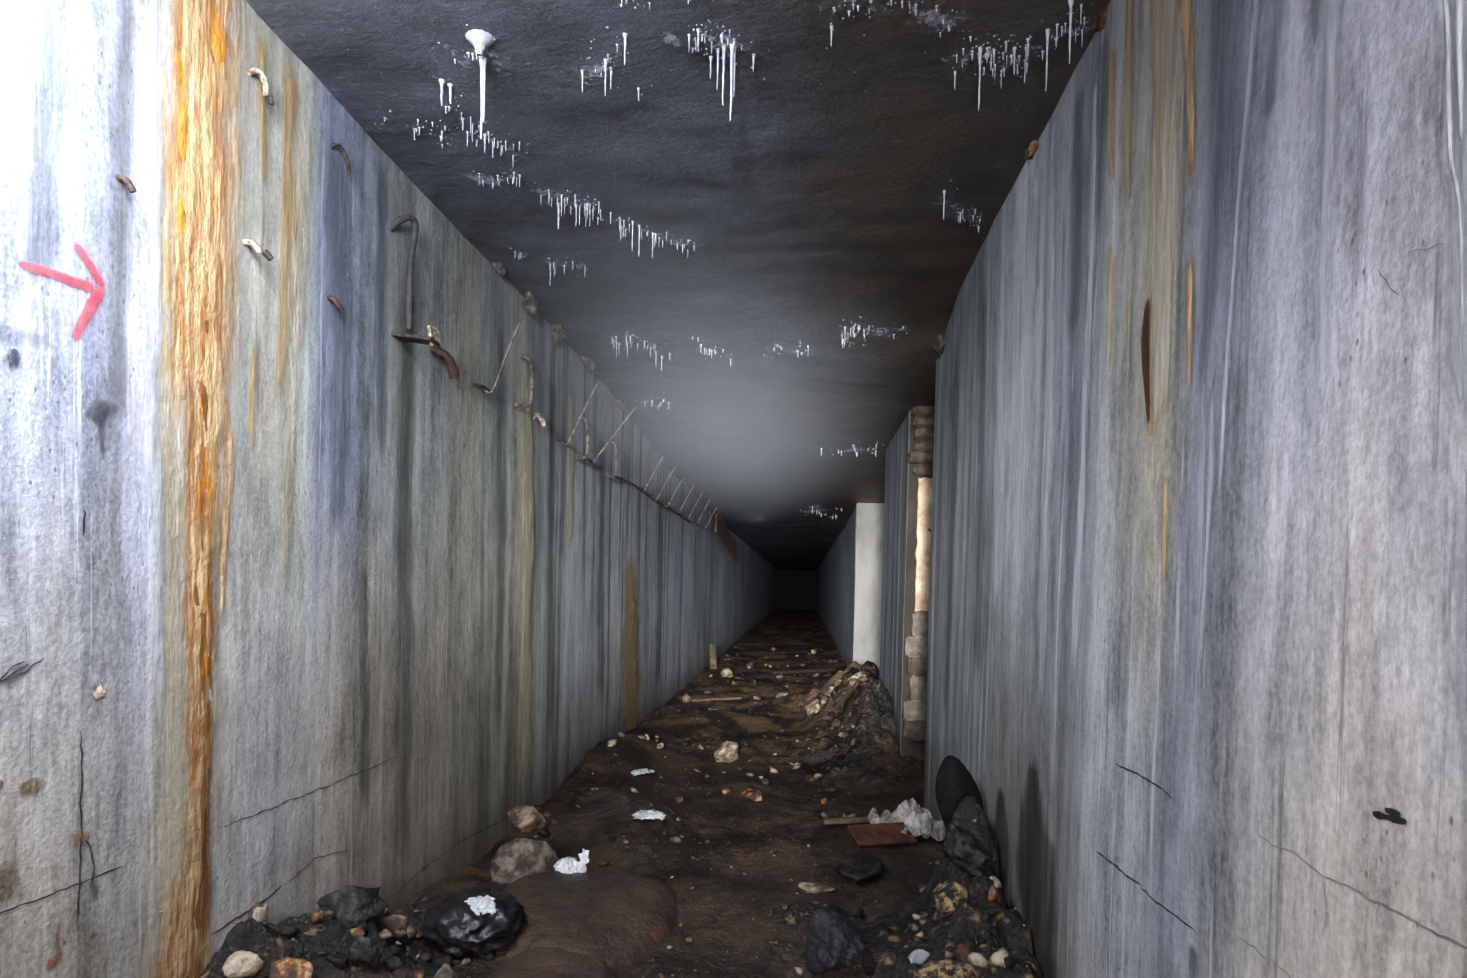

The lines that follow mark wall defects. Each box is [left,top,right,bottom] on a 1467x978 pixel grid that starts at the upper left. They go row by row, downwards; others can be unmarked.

leakage [820,0,1095,110]
leakage [379,24,704,258]
corrosion [1107,0,1194,421]
leakage [604,332,734,371]
leakage [840,316,907,346]
corrosion [145,0,312,978]
flaking render [0,865,22,899]
flaking render [0,778,42,795]
crack [0,731,127,927]
crack [212,850,350,934]
crack [1097,852,1198,936]
crack [1259,835,1467,949]